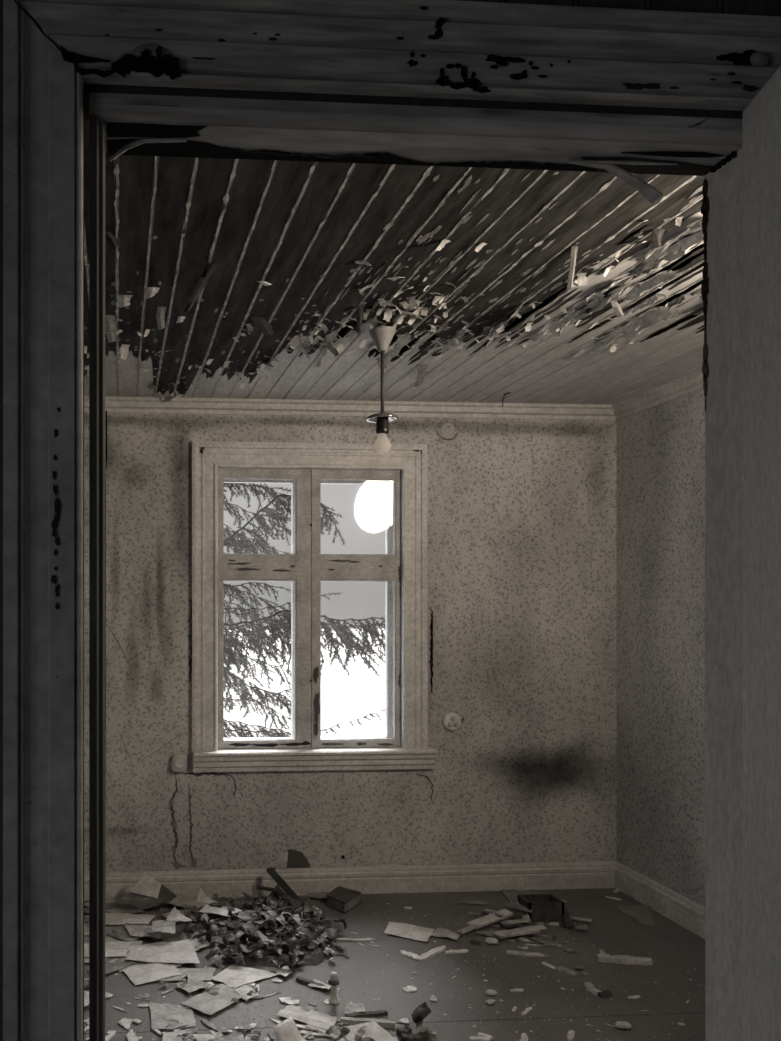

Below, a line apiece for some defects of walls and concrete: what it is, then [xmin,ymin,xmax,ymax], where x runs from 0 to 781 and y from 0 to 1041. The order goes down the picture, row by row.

spalling [427,17,446,40]
peeling [435,63,491,93]
peeling [105,122,737,412]
spalling [51,454,61,610]